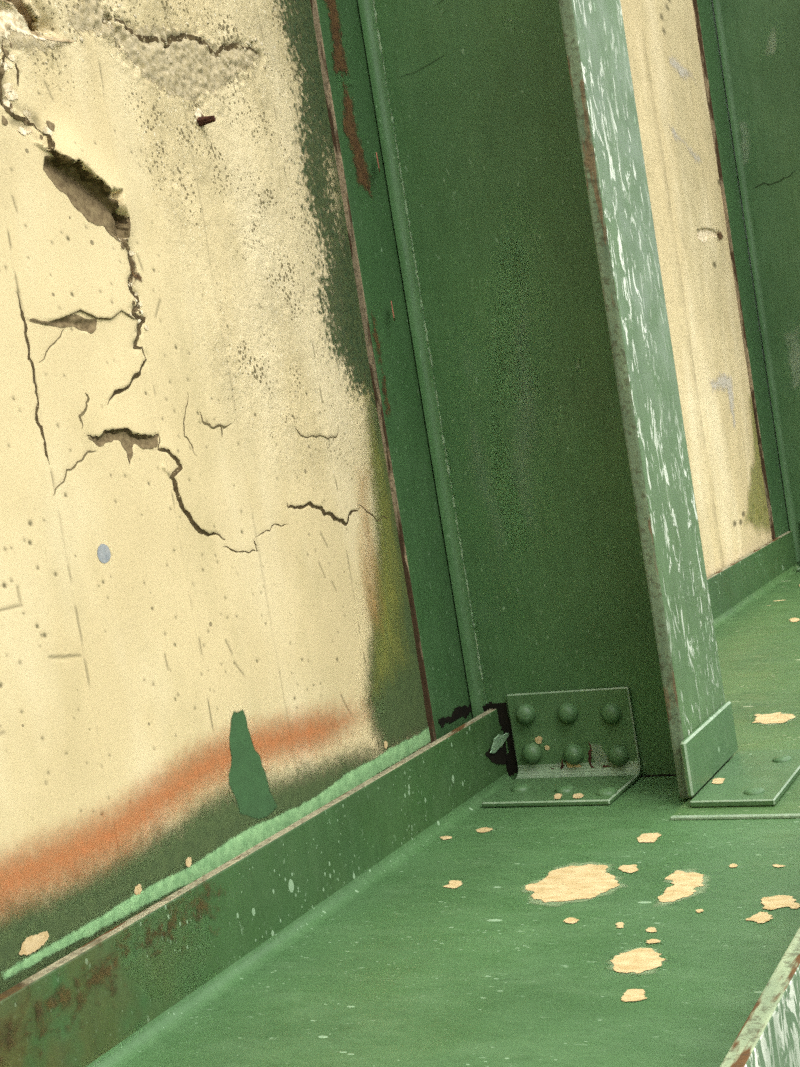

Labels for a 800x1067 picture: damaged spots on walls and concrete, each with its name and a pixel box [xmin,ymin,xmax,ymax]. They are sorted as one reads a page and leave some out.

spalling [0,0,257,139]
crack [18,231,149,493]
crack [158,395,389,553]
peeling [752,712,795,725]
peeling [490,733,509,753]
peeling [637,833,661,842]
peeling [443,880,462,888]
peeling [523,862,638,906]
peeling [658,870,708,905]
peeling [746,895,800,923]
peeling [610,927,666,974]
peeling [621,989,647,1002]